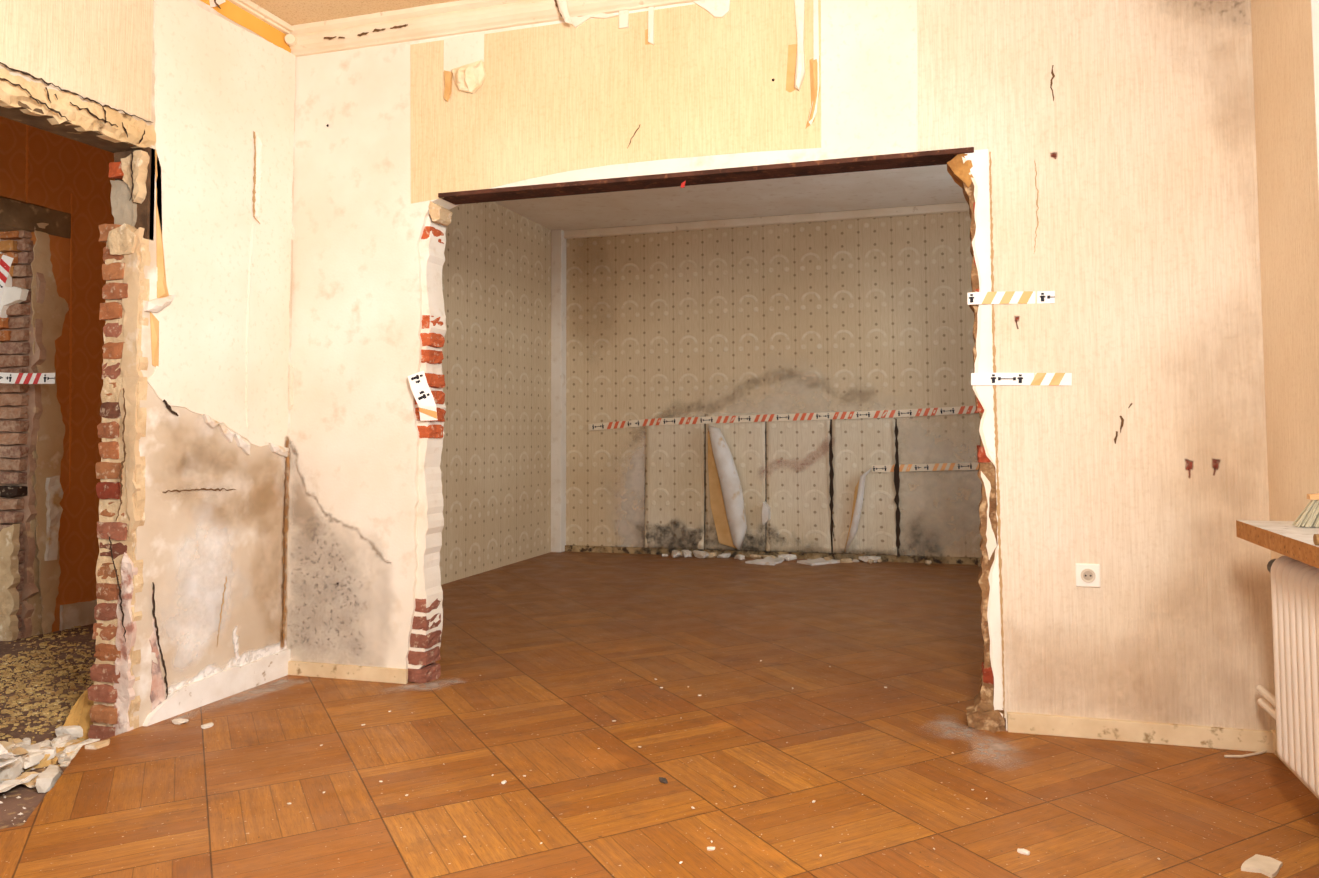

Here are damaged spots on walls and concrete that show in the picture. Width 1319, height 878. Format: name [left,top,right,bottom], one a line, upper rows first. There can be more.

peeling [444,32,486,101]
crack [116,388,126,520]
crack [163,486,236,494]
leakage [292,449,389,649]
leakage [619,511,778,556]
leakage [898,427,982,557]